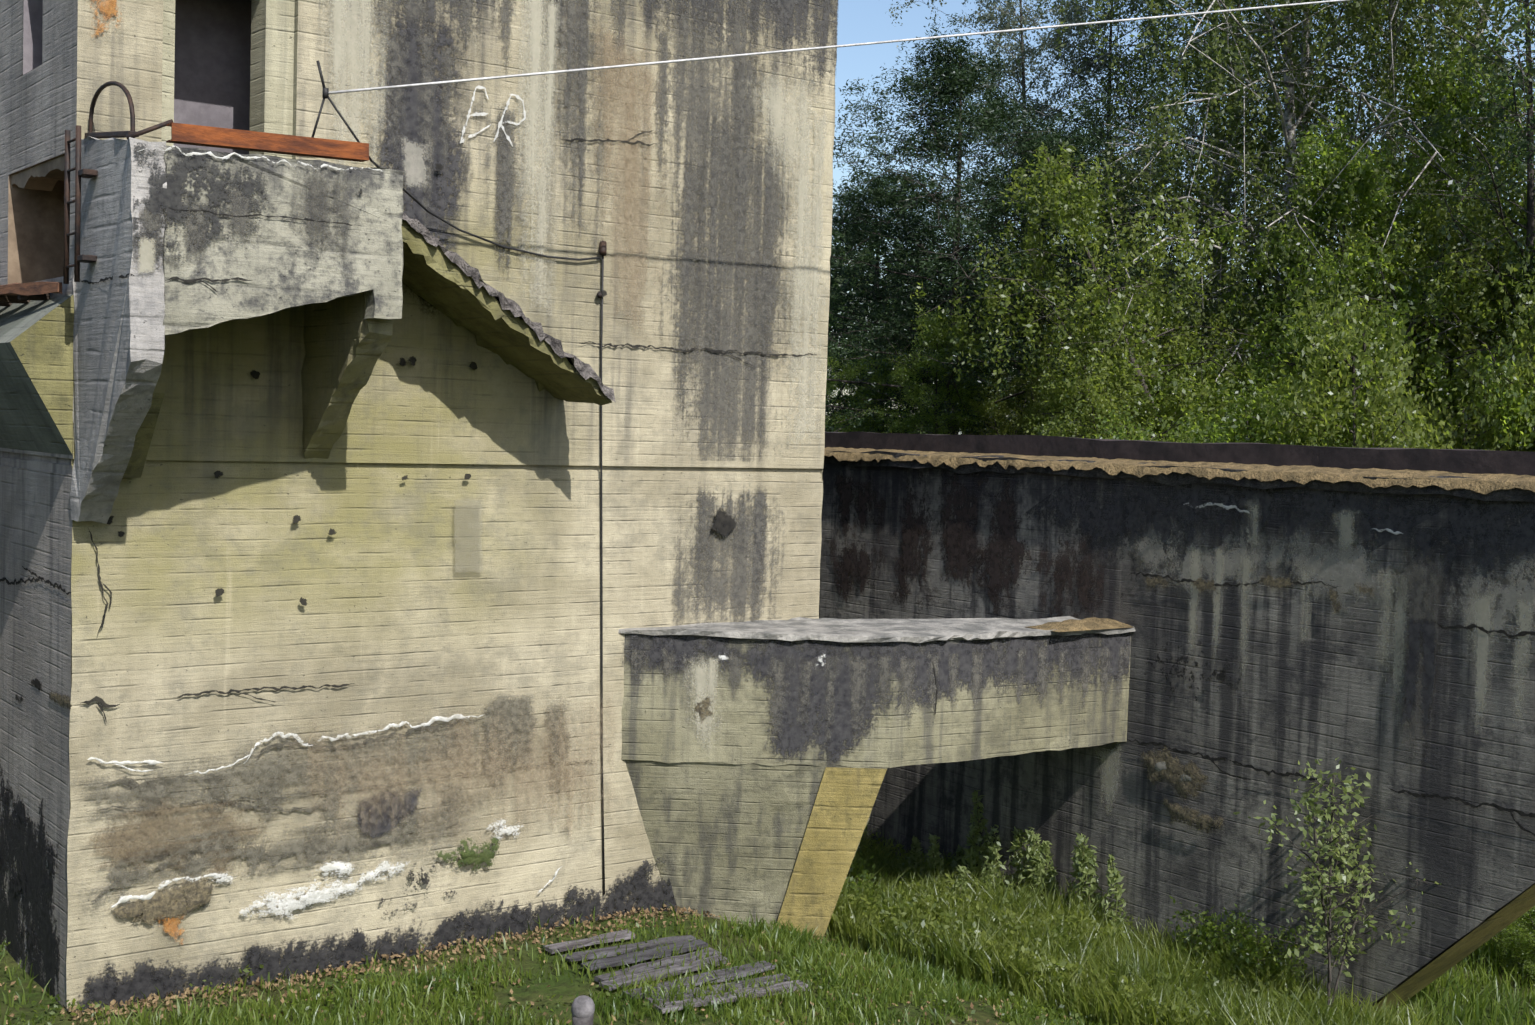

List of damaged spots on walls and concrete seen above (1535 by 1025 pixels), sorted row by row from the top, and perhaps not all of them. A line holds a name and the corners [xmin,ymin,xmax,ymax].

corrosion [90,0,119,35]
leakage [133,0,839,461]
crack [0,528,112,637]
leakage [622,470,1535,762]
crack [1435,622,1535,638]
crack [82,696,120,723]
crack [173,683,355,702]
leakage [79,695,573,919]
spalling [114,875,213,926]